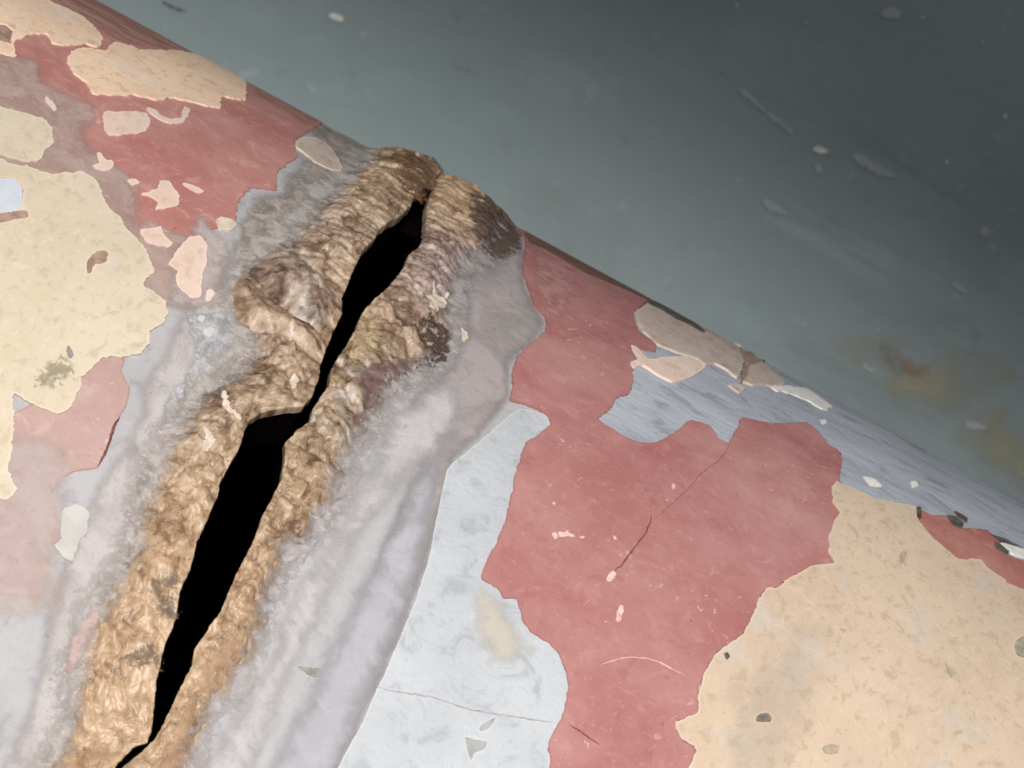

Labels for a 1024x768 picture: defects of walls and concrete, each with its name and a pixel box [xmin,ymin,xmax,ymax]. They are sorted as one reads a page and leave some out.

crack [116,621,176,768]
peeling [0,0,342,615]
water stain [5,124,378,768]
crack [197,376,328,543]
water stain [183,220,542,768]
crack [348,187,426,284]
crack [615,445,730,572]
peeling [338,227,1024,768]